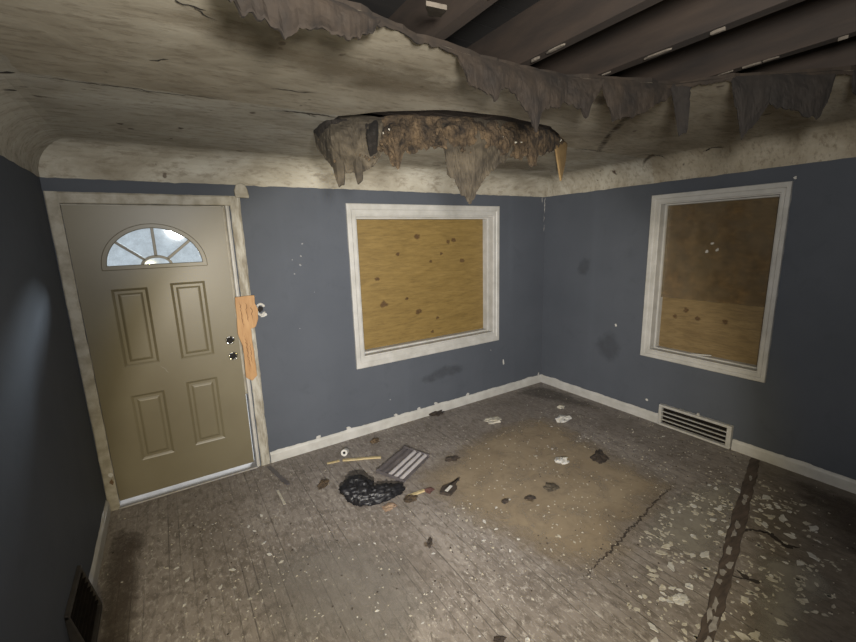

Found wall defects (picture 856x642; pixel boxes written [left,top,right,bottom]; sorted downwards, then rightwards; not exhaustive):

spalling [372,15,473,59]